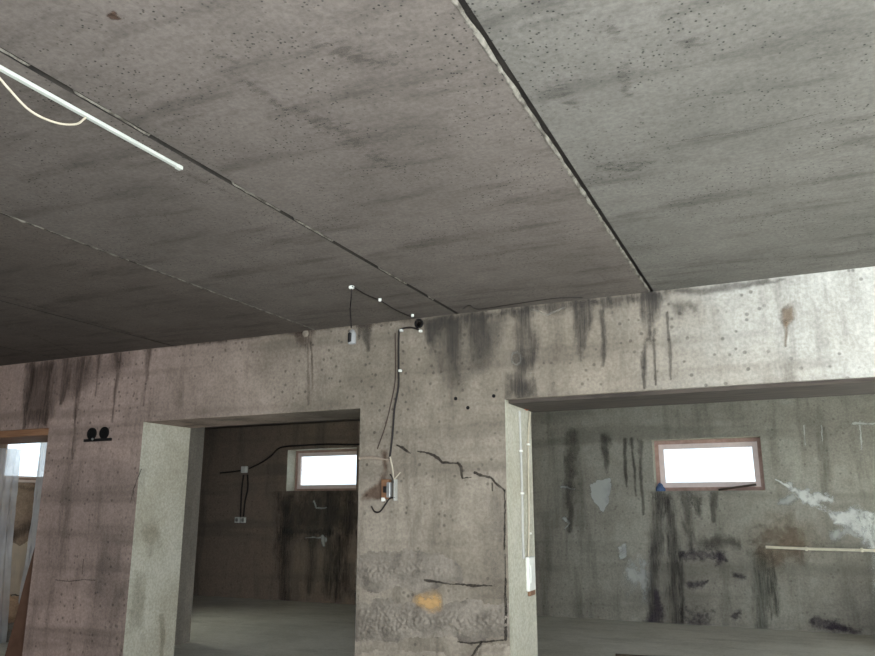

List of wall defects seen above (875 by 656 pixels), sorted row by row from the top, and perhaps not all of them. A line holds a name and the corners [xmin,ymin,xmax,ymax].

water stain [427,289,693,398]
water stain [279,453,387,574]
crack [396,445,508,656]
water stain [623,438,642,493]
water stain [643,494,728,625]
water stain [755,526,804,612]